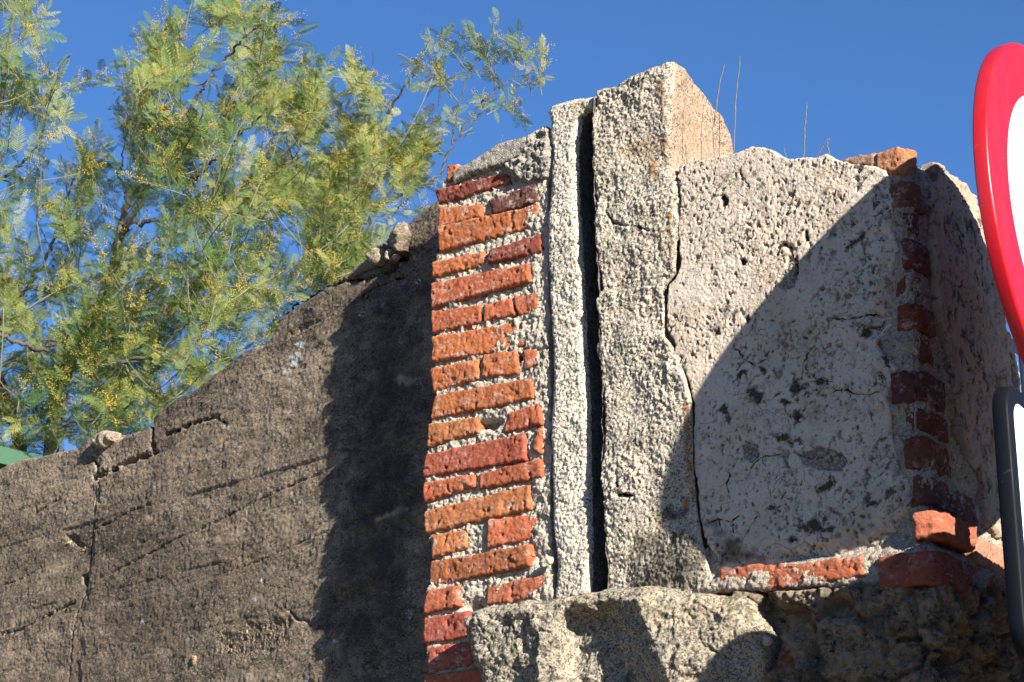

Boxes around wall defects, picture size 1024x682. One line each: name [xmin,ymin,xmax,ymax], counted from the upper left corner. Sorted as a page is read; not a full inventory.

crack [2,417,317,682]